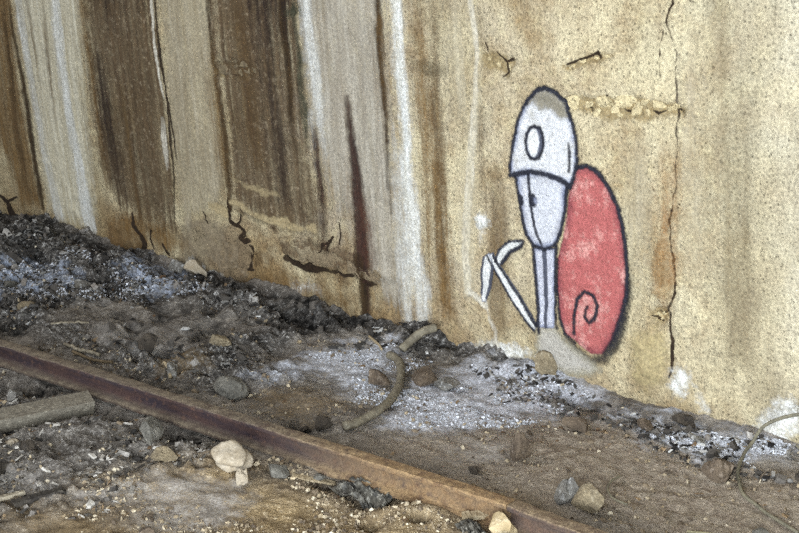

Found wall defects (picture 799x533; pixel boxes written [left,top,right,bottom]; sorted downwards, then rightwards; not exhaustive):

leakage [17,10,35,103]
leakage [47,0,96,232]
leakage [84,0,177,231]
leakage [206,0,322,232]
corrosion [375,0,388,144]
spalling [565,94,686,120]
crack [131,212,170,256]
crack [226,199,254,271]
peeling [181,200,385,287]
corrosion [346,98,369,314]
crack [659,0,680,378]